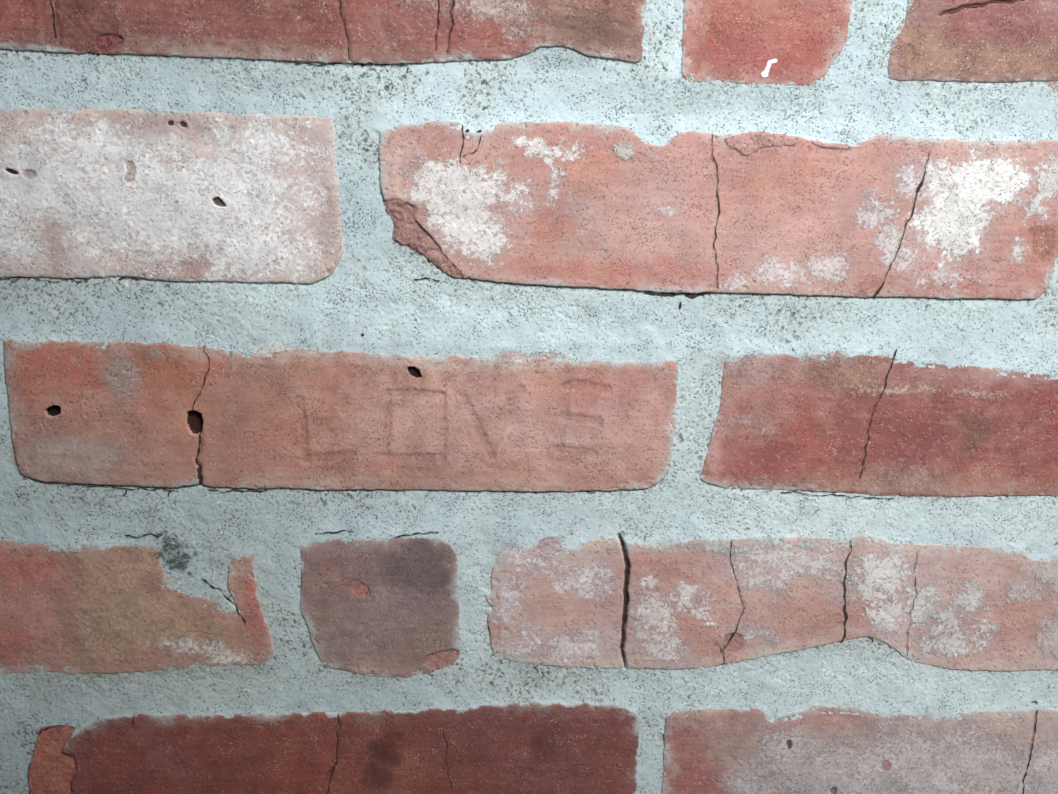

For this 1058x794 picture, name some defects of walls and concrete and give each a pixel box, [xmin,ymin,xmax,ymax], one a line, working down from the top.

damp [0,99,363,297]
spalling [383,199,463,278]
efflorescence [392,135,593,268]
crack [712,133,721,288]
crack [874,153,930,297]
efflorescence [853,147,1058,292]
crack [193,346,210,485]
crack [618,535,630,668]
damp [487,538,782,676]
damp [701,537,1058,663]
spalling [29,725,76,794]
crack [1023,709,1038,794]